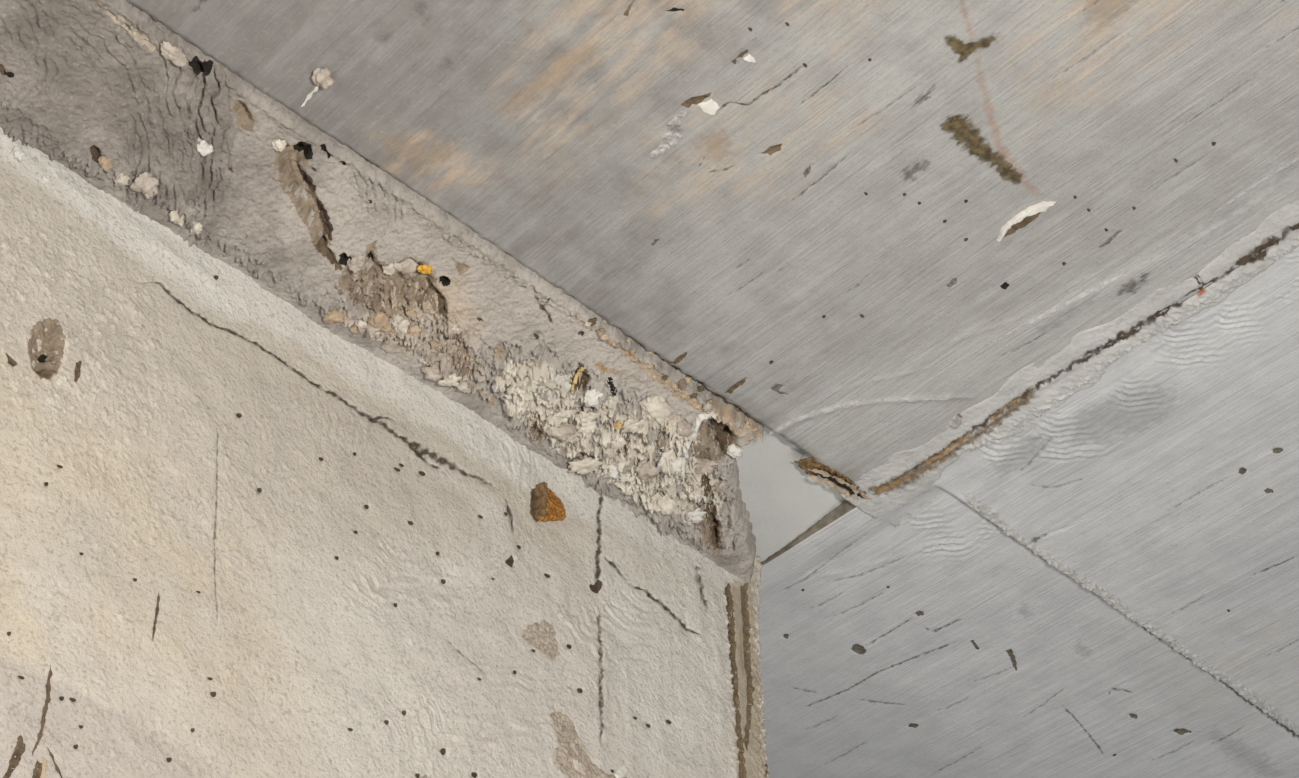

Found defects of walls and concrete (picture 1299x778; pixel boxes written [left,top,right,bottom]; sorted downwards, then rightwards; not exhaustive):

damp [945,36,995,63]
damp [941,115,1022,184]
crack [156,282,483,481]
spalling [272,139,763,555]
crack [913,225,1299,469]